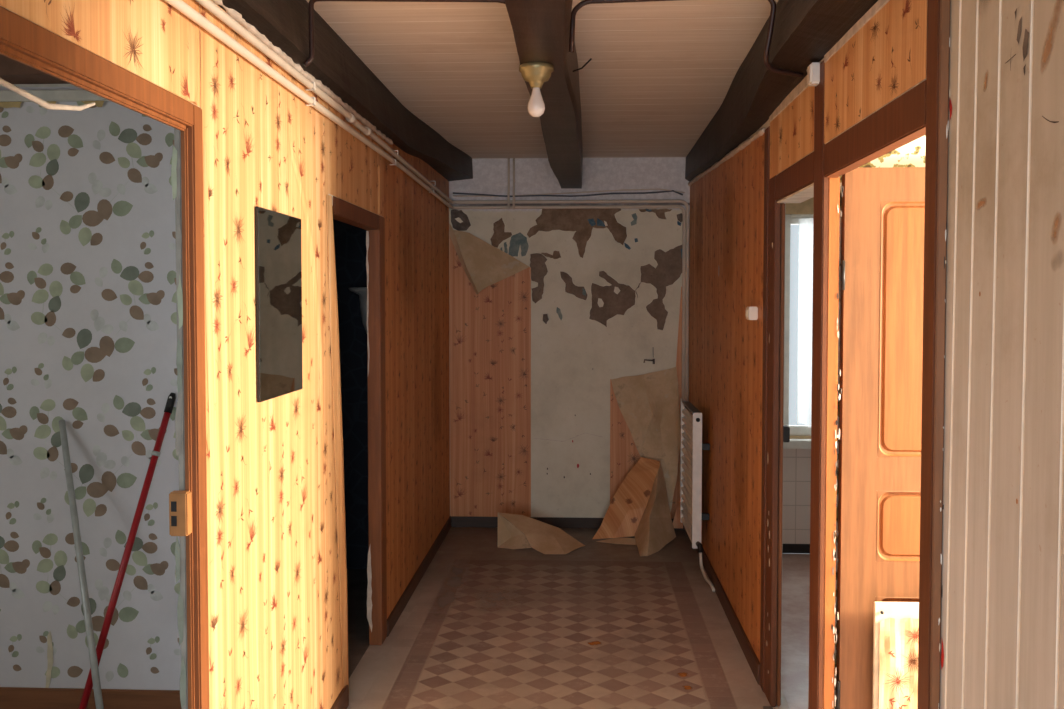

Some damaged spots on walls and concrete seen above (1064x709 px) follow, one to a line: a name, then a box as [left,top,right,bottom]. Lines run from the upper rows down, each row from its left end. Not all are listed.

peeling [450,209,472,231]
peeling [490,208,683,331]